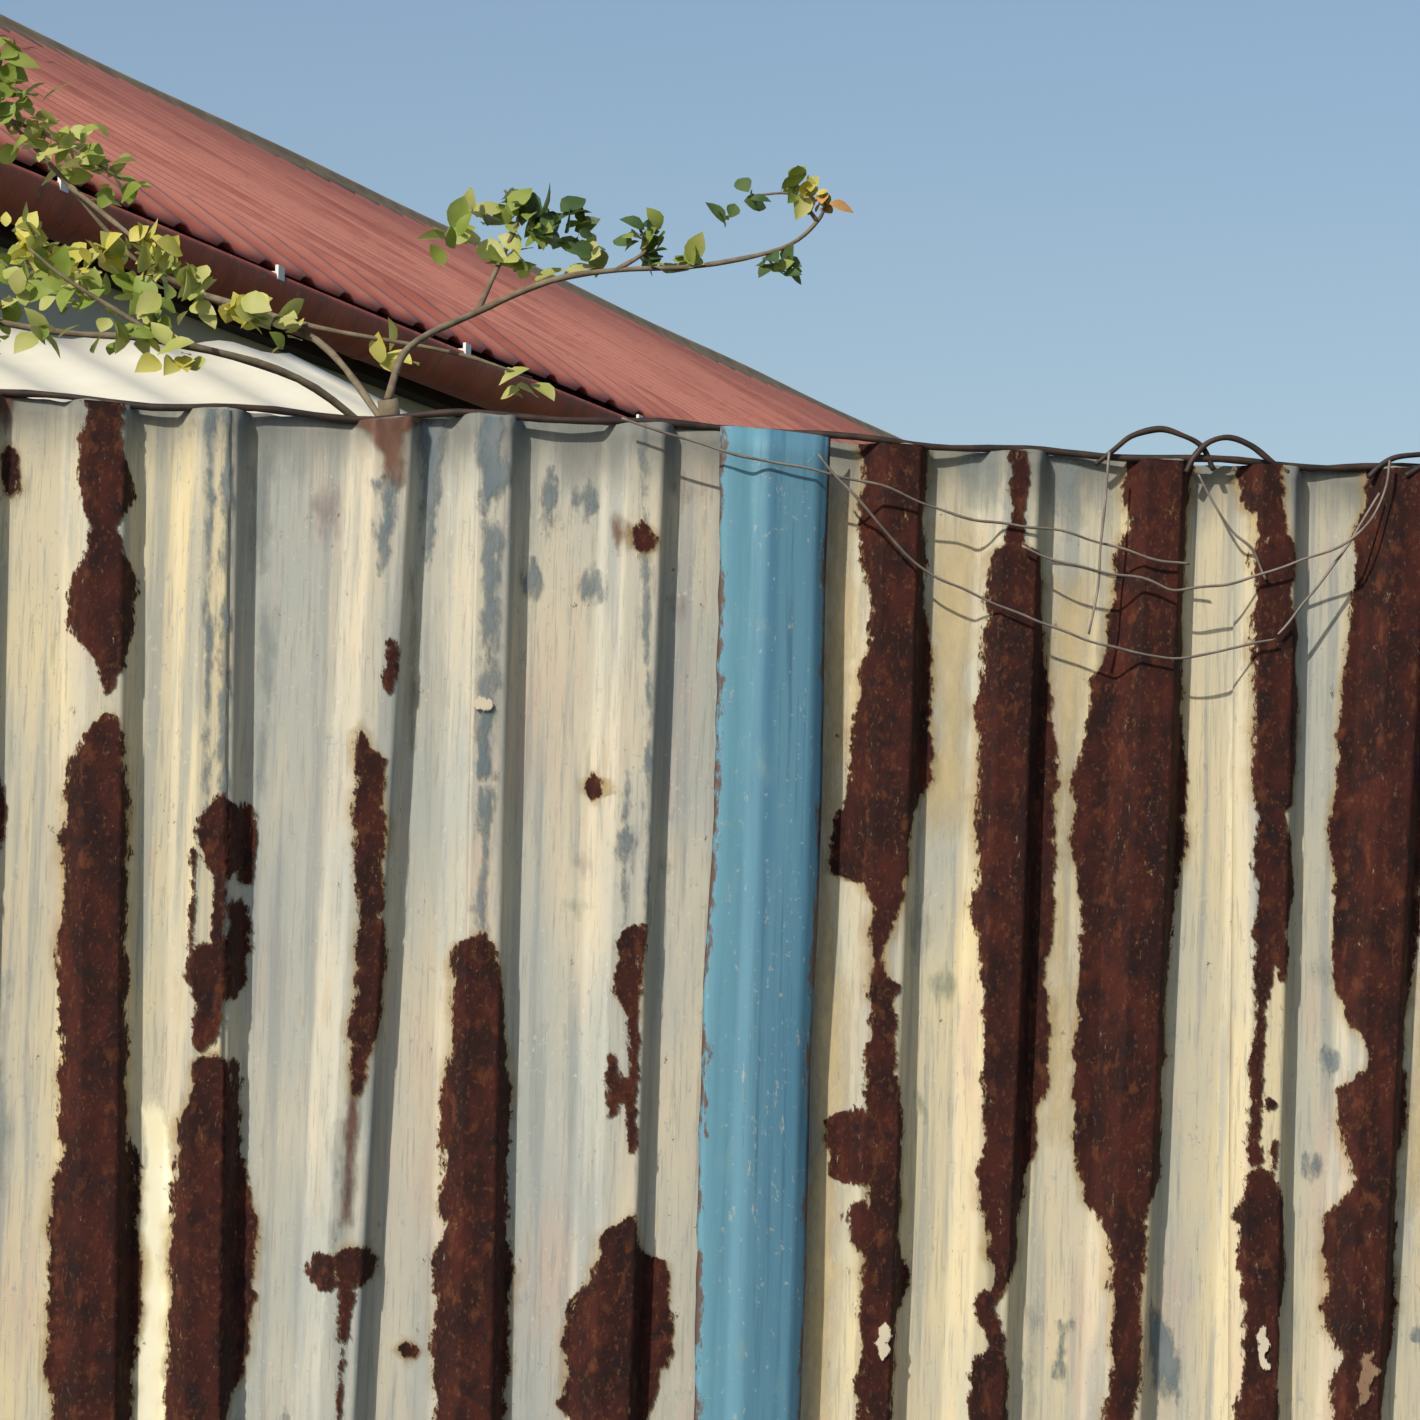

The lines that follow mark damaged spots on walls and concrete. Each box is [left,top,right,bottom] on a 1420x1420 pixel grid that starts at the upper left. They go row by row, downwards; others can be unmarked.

rust [1,444,21,499]
rust [64,400,141,694]
rust [33,712,261,1420]
rust [303,1245,379,1420]
rust [344,729,389,1218]
rust [396,930,521,1420]
rust [555,1214,674,1420]
rust [601,923,648,1154]
rust [822,442,942,1420]
rust [964,450,1195,1420]
rust [1230,464,1300,1420]
rust [1318,467,1420,1420]